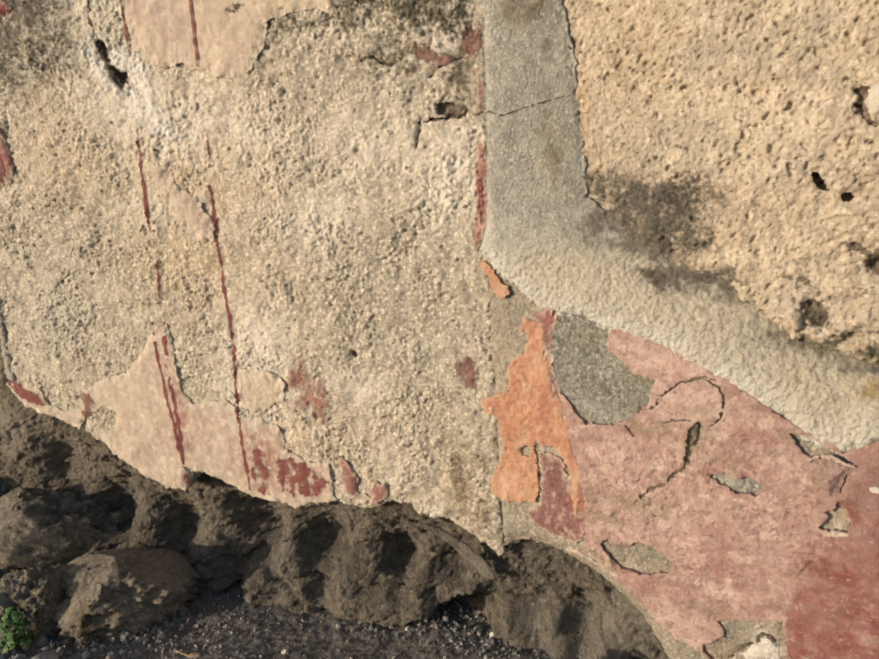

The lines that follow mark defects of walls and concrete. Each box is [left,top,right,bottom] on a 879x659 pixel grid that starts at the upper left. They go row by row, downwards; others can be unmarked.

crack [416,95,564,147]
peeling [455,357,479,390]
peeling [6,324,389,508]
peeling [481,307,655,570]
crack [626,376,726,497]
spalling [791,433,852,463]
spalling [711,473,762,495]
peeling [404,521,496,580]
spalling [602,539,673,573]
spalling [703,618,787,659]